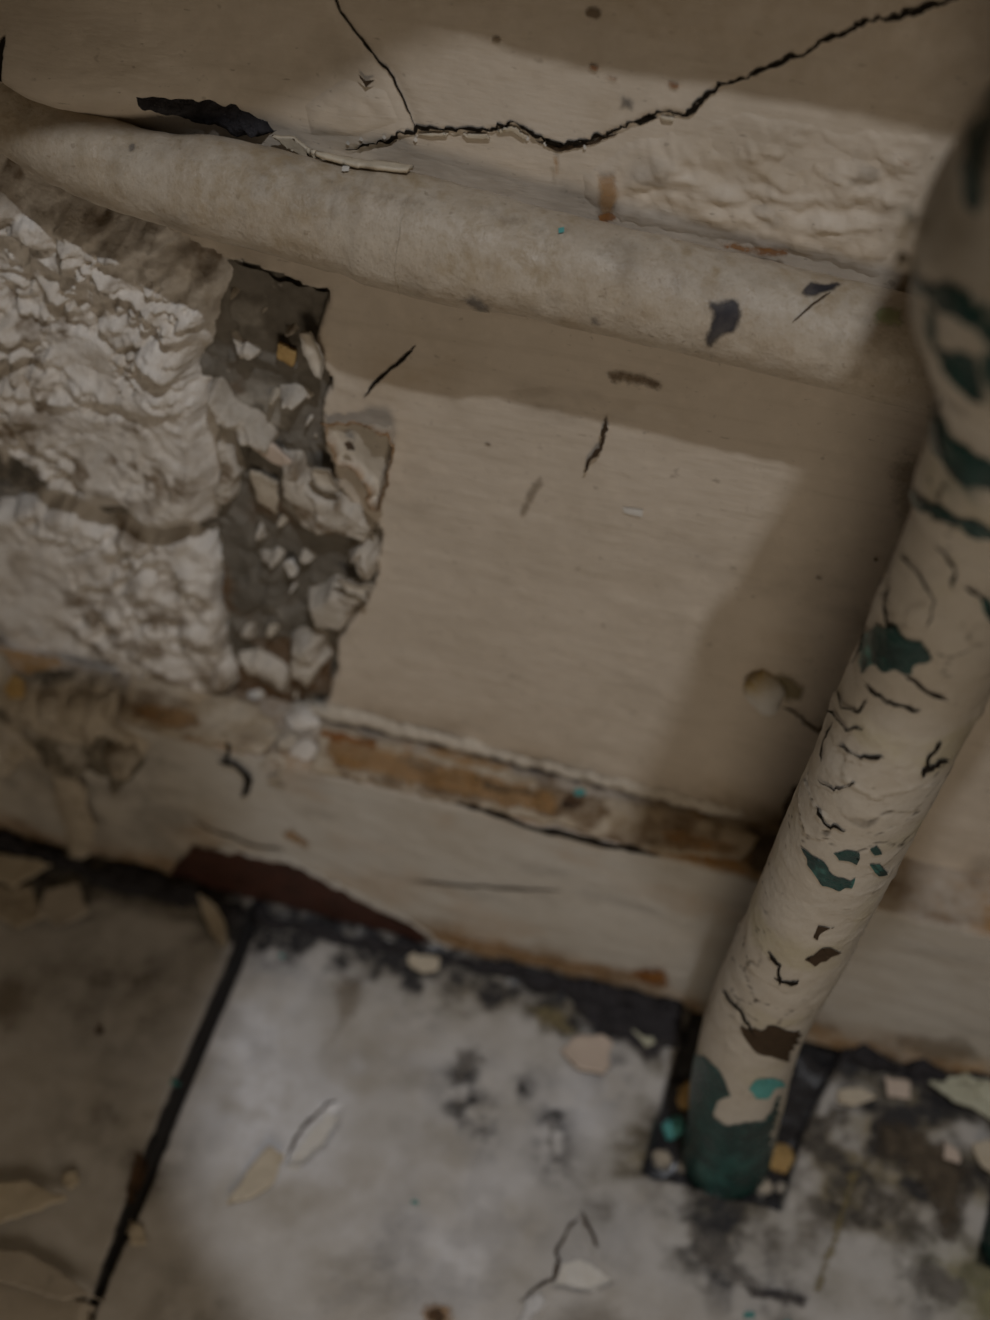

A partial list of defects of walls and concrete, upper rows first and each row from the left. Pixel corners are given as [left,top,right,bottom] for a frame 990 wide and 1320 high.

crack [335,0,955,152]
peeling [911,256,982,404]
flaking render [0,154,395,755]
crack [781,490,990,832]
peeling [859,624,932,675]
peeling [801,846,888,891]
peeling [805,926,841,967]
water stain [528,986,665,1062]
peeling [740,1026,802,1062]
peeling [929,1071,990,1119]
water stain [871,1123,972,1241]
water stain [689,1172,859,1318]